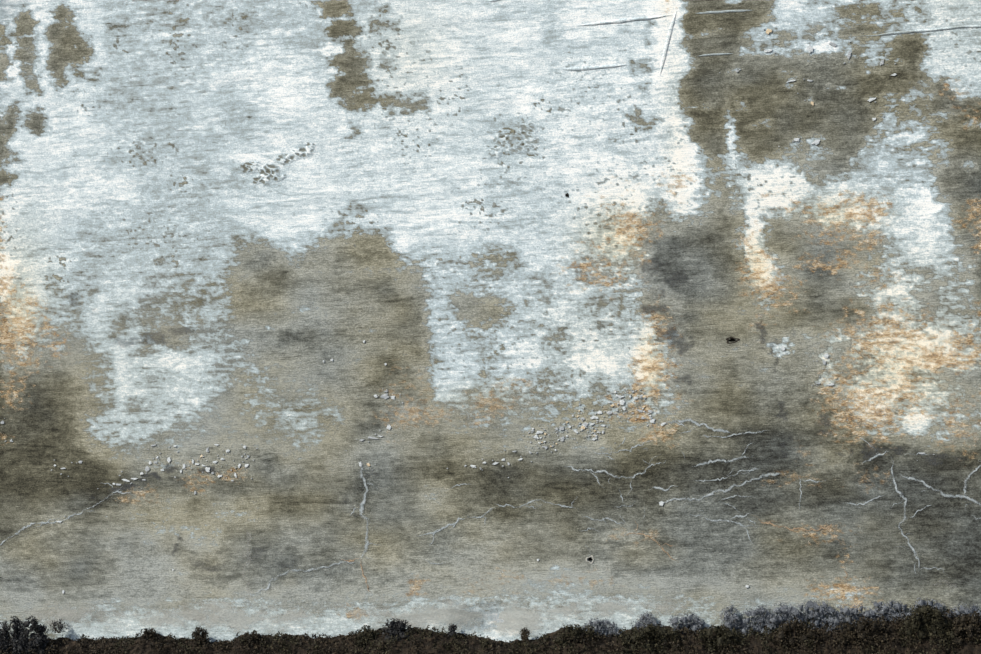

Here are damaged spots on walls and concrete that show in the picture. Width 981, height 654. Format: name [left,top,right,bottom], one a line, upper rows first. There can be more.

corrosion [818,303,981,445]
leakage [112,464,174,493]
crack [258,470,375,592]
crack [420,418,838,564]
crack [848,438,981,578]
efflorescence [379,601,581,632]